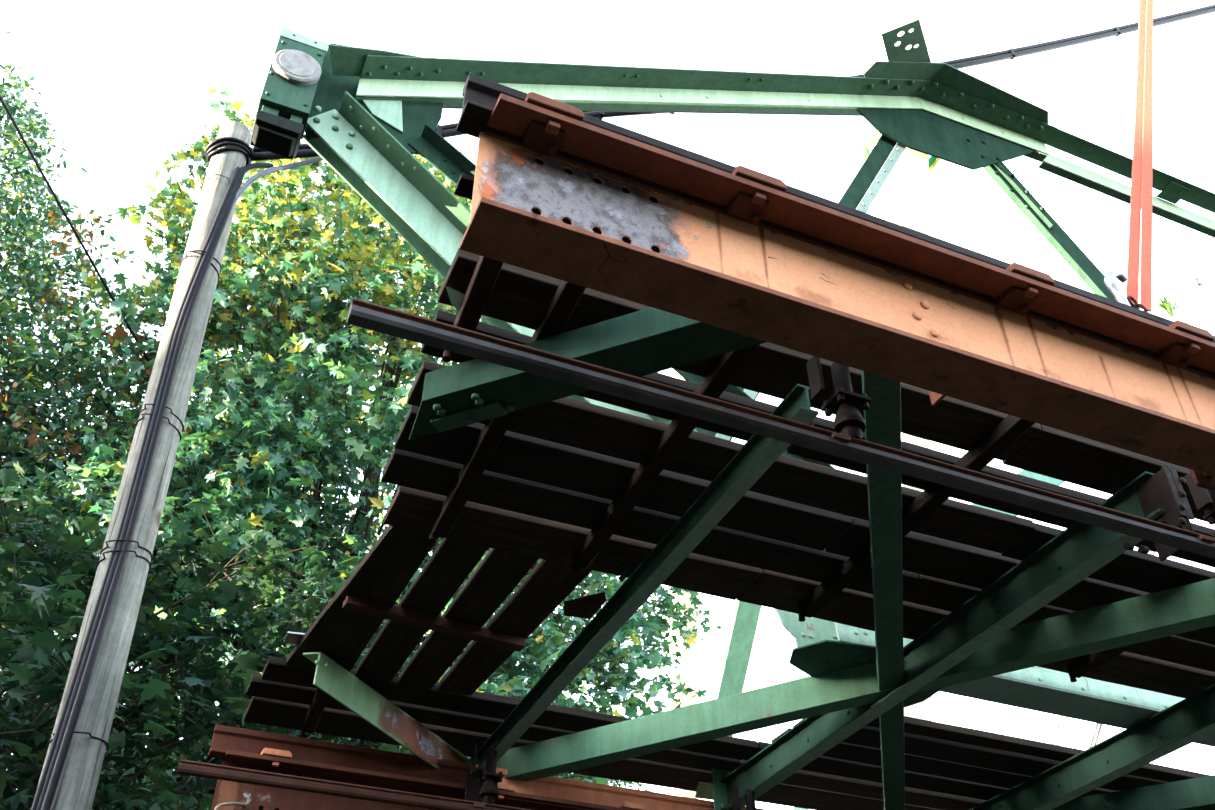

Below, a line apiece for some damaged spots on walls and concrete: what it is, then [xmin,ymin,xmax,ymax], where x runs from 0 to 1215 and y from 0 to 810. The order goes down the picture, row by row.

peeling [478,148,689,259]